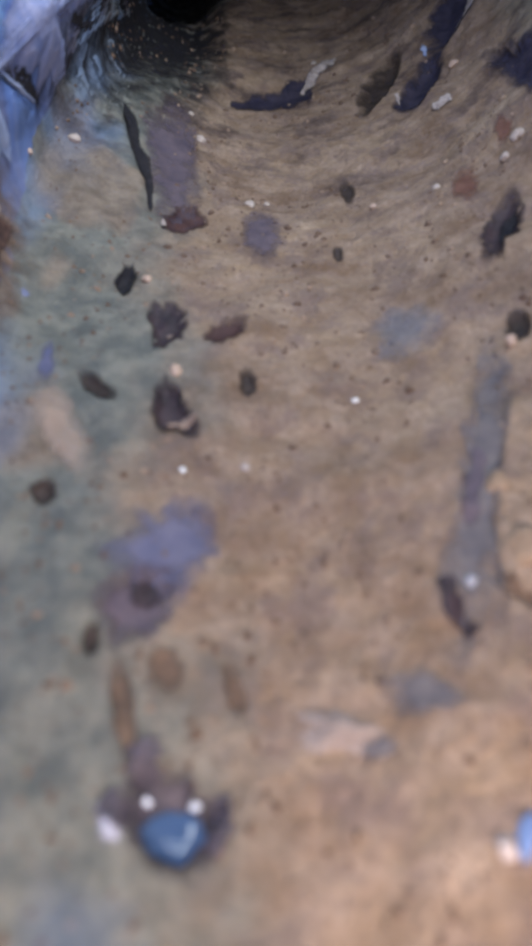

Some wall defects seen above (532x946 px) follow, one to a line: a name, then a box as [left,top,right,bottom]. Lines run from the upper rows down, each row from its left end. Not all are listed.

rust [0,178,21,315]